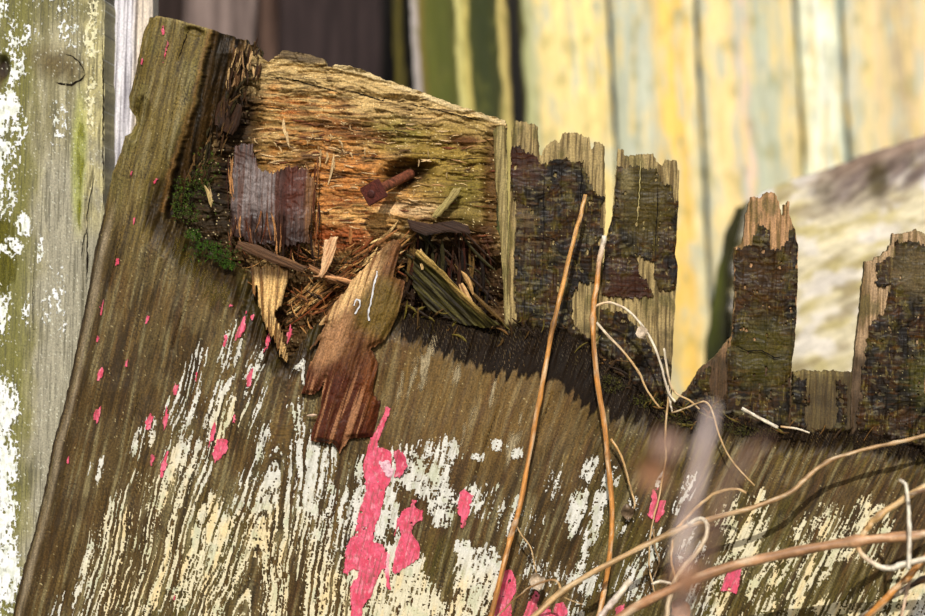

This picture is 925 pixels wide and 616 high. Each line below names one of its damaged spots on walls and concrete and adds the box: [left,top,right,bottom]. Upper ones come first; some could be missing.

peeling [0,0,67,347]
peeling [0,364,25,616]
peeling [48,311,693,616]
peeling [688,487,925,616]